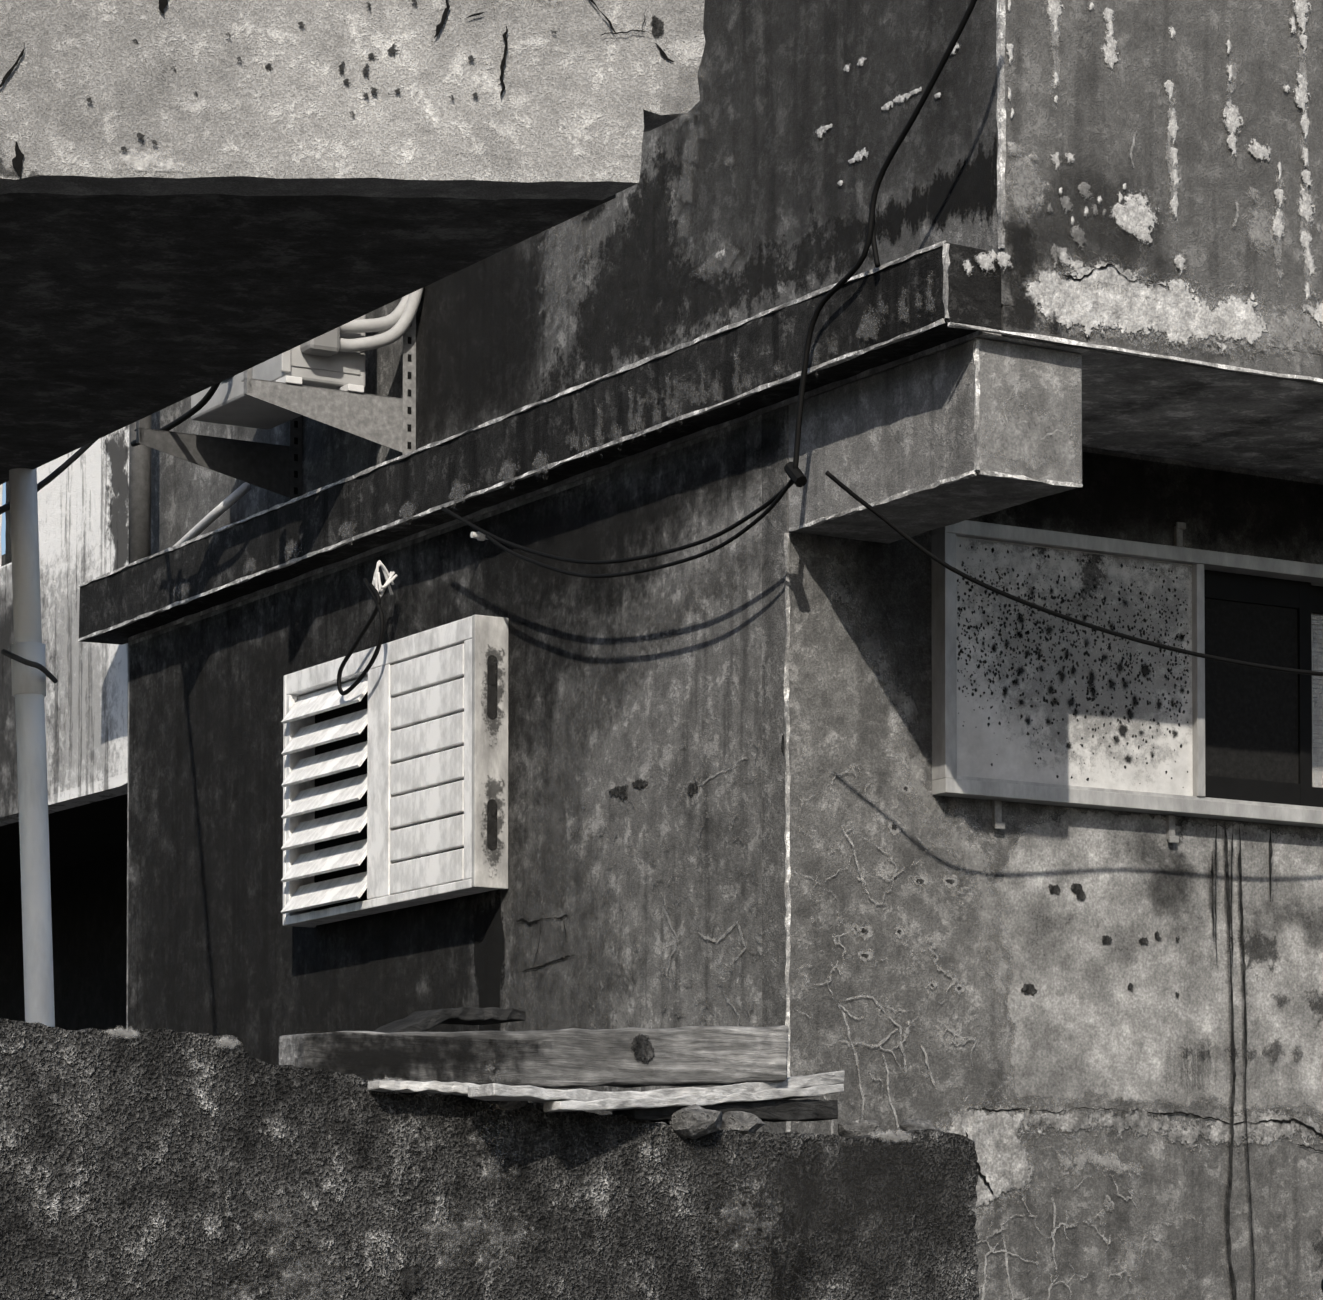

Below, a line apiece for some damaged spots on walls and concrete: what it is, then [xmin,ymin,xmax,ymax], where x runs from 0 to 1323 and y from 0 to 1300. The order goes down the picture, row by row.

crack [0,42,25,88]
crack [159,0,168,14]
crack [434,0,508,98]
crack [546,0,674,62]
leakage [537,134,1061,402]
leakage [570,356,751,451]
leakage [449,482,470,502]
leakage [498,451,549,483]
crack [794,750,990,1134]
leakage [820,540,1323,1300]
flaking render [936,1098,1039,1215]
crack [976,1165,1168,1300]